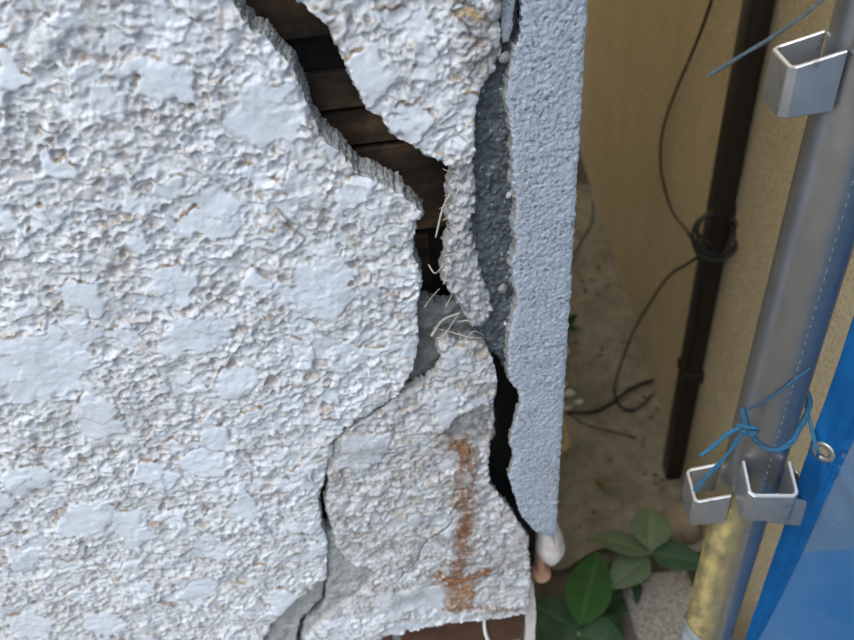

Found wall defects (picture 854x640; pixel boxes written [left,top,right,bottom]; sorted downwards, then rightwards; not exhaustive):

spalling [405,0,519,383]
crack [232,0,532,640]
corrosion [448,440,478,478]
spalling [444,405,493,441]
spalling [266,531,375,640]
corrosion [433,488,525,613]